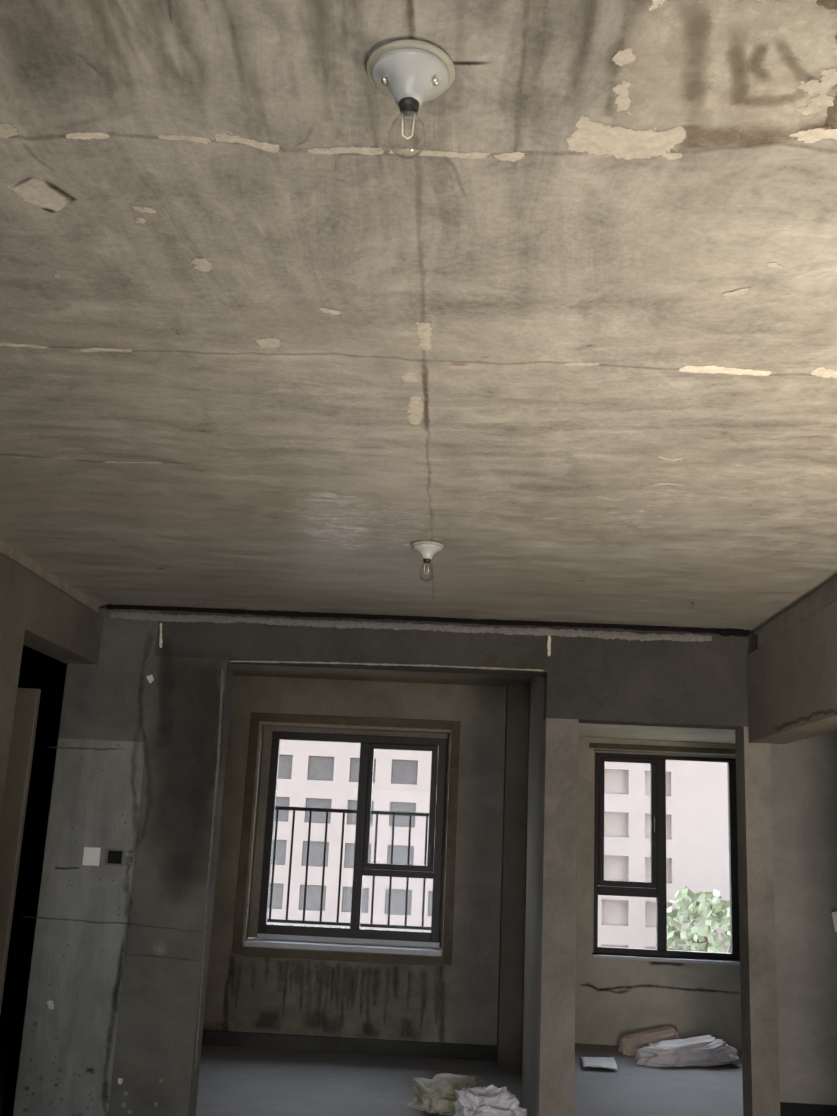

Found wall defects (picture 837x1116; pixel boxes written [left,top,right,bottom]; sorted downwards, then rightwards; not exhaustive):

peeling [817,0,837,9]
peeling [566,48,837,165]
crack [65,132,110,140]
crack [157,132,525,162]
spalling [7,178,75,212]
crack [131,206,159,214]
crack [0,342,48,350]
crack [80,345,133,353]
crack [255,338,282,348]
crack [401,322,432,425]
crack [679,365,772,376]
crack [809,367,837,378]